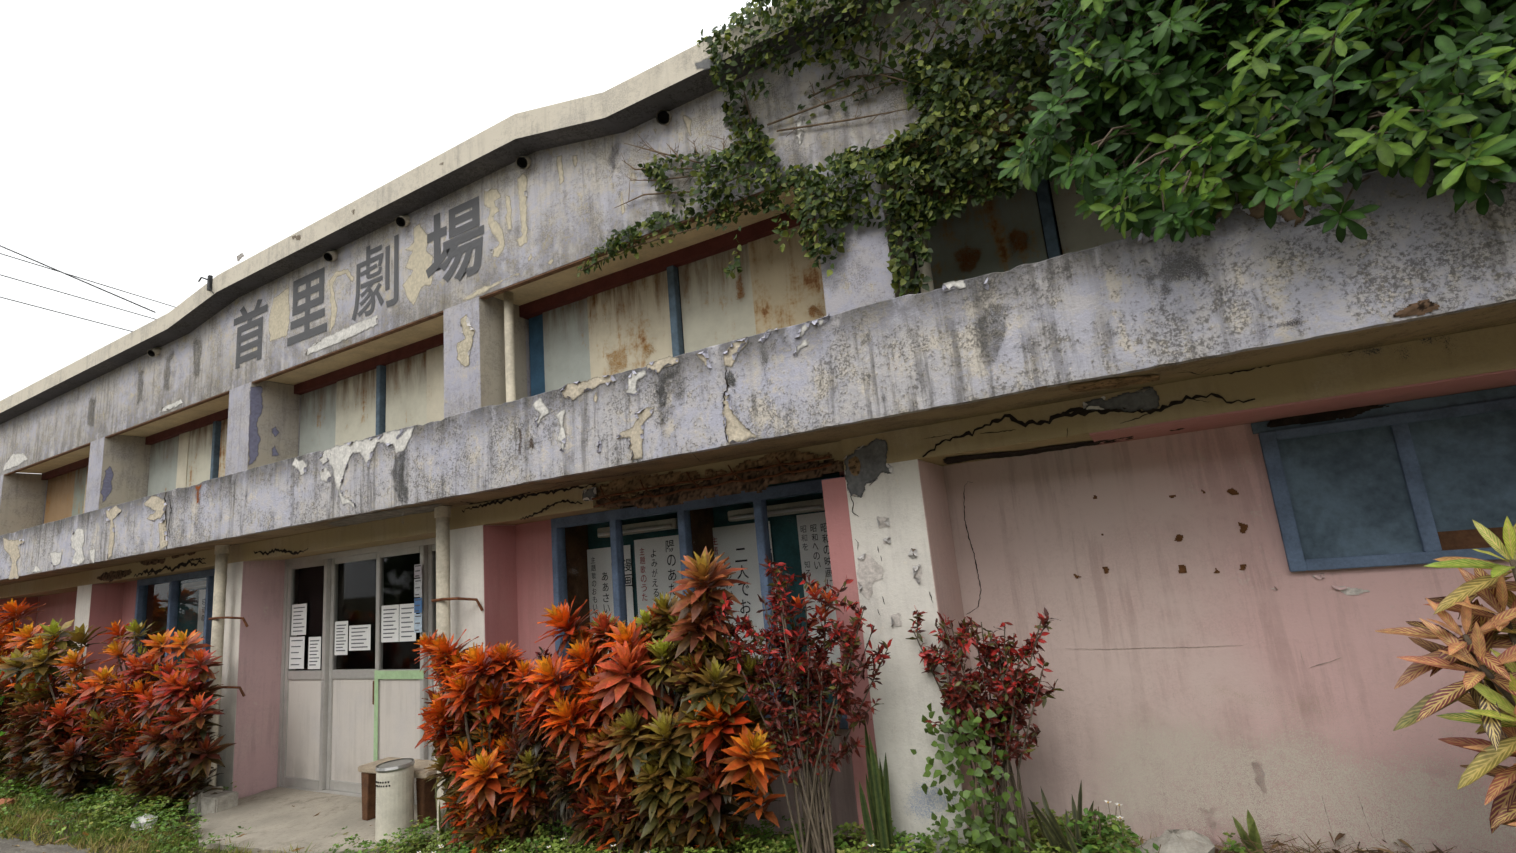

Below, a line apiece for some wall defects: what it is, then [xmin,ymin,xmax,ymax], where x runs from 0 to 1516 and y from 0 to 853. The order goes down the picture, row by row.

peeling [456,174,553,367]
peeling [793,314,830,357]
damp [974,300,1012,368]
damp [1142,247,1217,311]
spalling [1393,299,1440,318]
peeling [533,356,679,460]
peeling [722,393,757,445]
crack [922,365,1271,457]
peeling [249,386,441,527]
spalling [582,438,893,509]
peeling [3,467,196,582]
peeling [908,548,922,585]